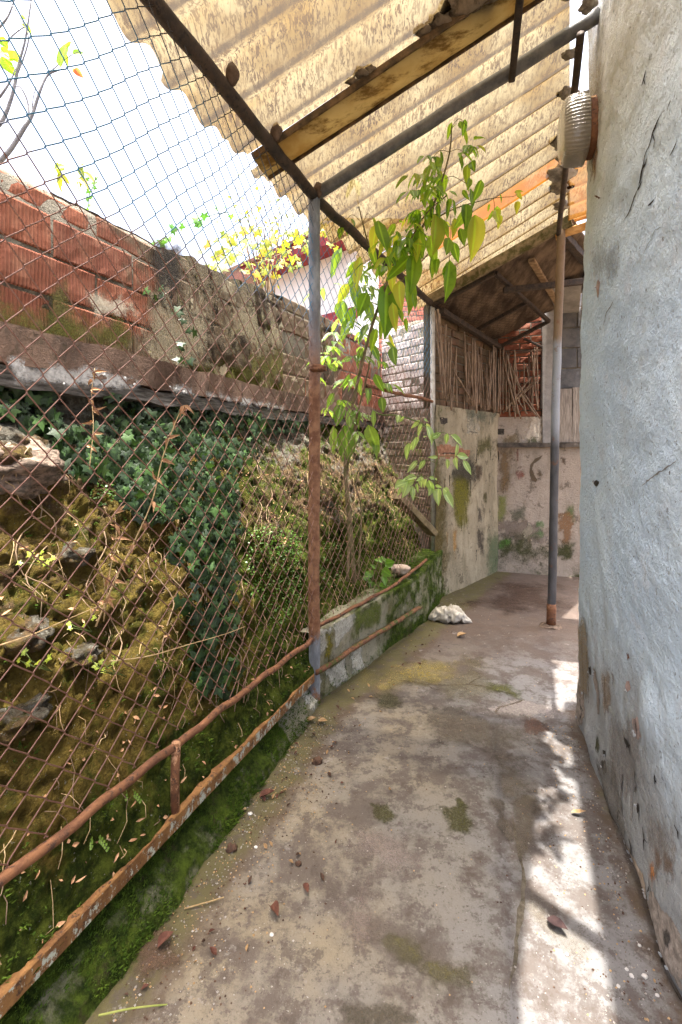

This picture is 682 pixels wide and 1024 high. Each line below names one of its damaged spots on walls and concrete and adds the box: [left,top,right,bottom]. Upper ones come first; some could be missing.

crack [625,100,677,254]
leakage [444,434,518,496]
leakage [530,456,542,482]
leakage [445,493,487,560]
spalling [498,512,574,549]
leakage [498,508,574,564]